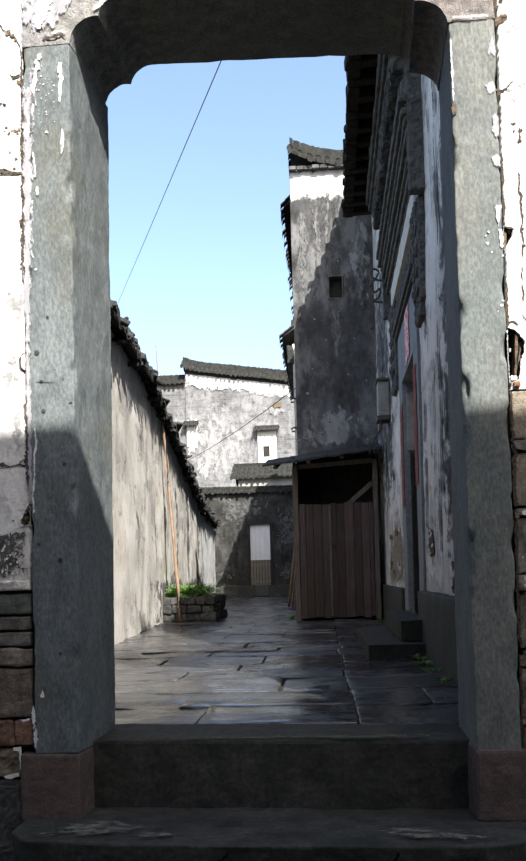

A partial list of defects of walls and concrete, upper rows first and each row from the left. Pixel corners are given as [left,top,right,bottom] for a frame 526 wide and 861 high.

crack [0,25,22,56]
crack [511,122,523,143]
crack [509,172,526,326]
leakage [423,80,453,558]
crack [0,455,30,480]
spalling [390,511,404,588]